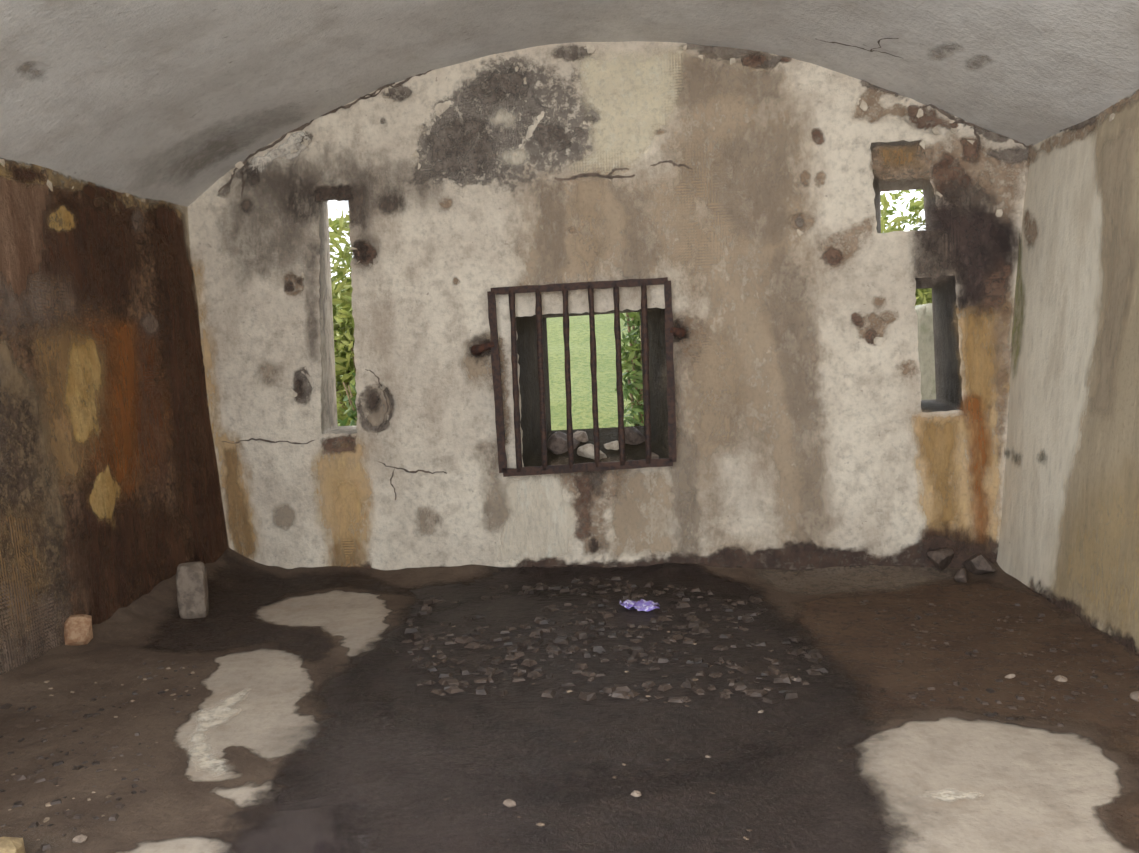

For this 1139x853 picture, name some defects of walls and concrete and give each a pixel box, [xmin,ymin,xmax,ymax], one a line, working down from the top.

crack [554,160,693,181]
flaking render [855,80,1139,245]
damp [0,342,80,675]
crack [222,437,314,445]
corrosion [317,435,371,567]
crack [380,462,447,500]
damp [145,100,1139,853]
corrosion [915,292,1013,547]